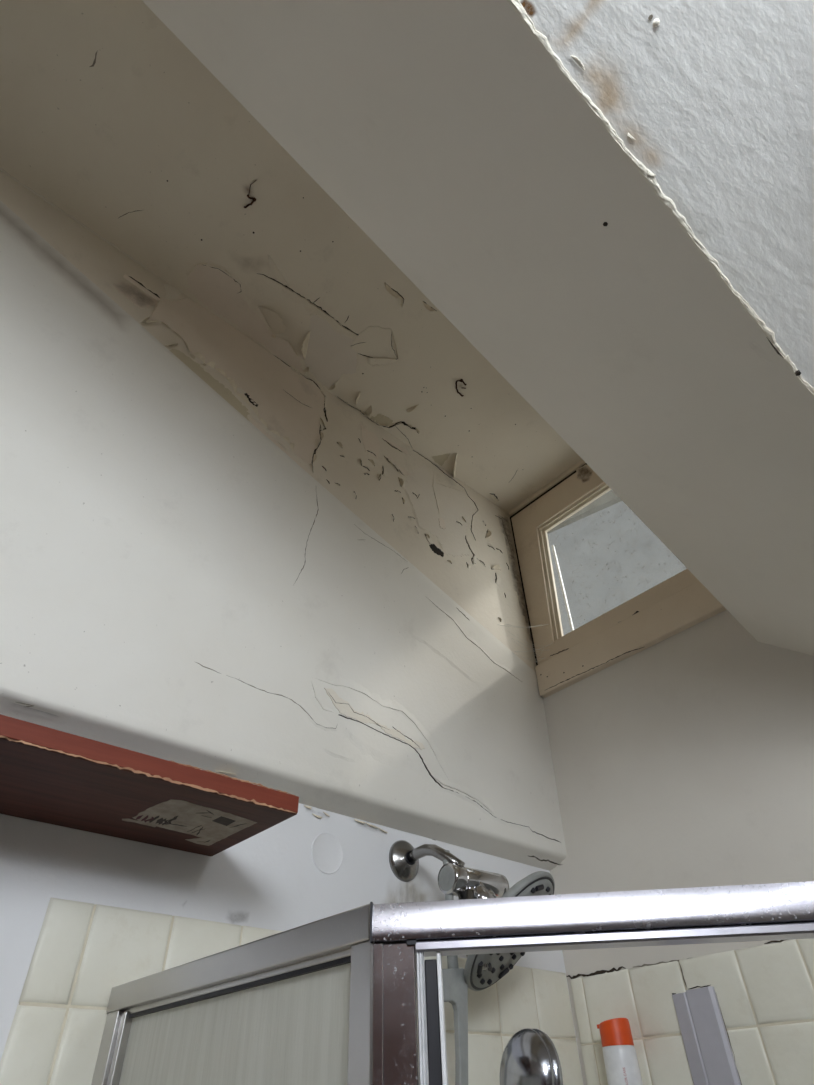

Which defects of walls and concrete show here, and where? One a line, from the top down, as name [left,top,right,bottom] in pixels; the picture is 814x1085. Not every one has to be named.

corrosion [521,0,535,16]
crack [274,355,512,565]
crack [293,502,319,586]
spalling [426,536,444,557]
crack [409,595,643,691]
crack [196,662,563,865]